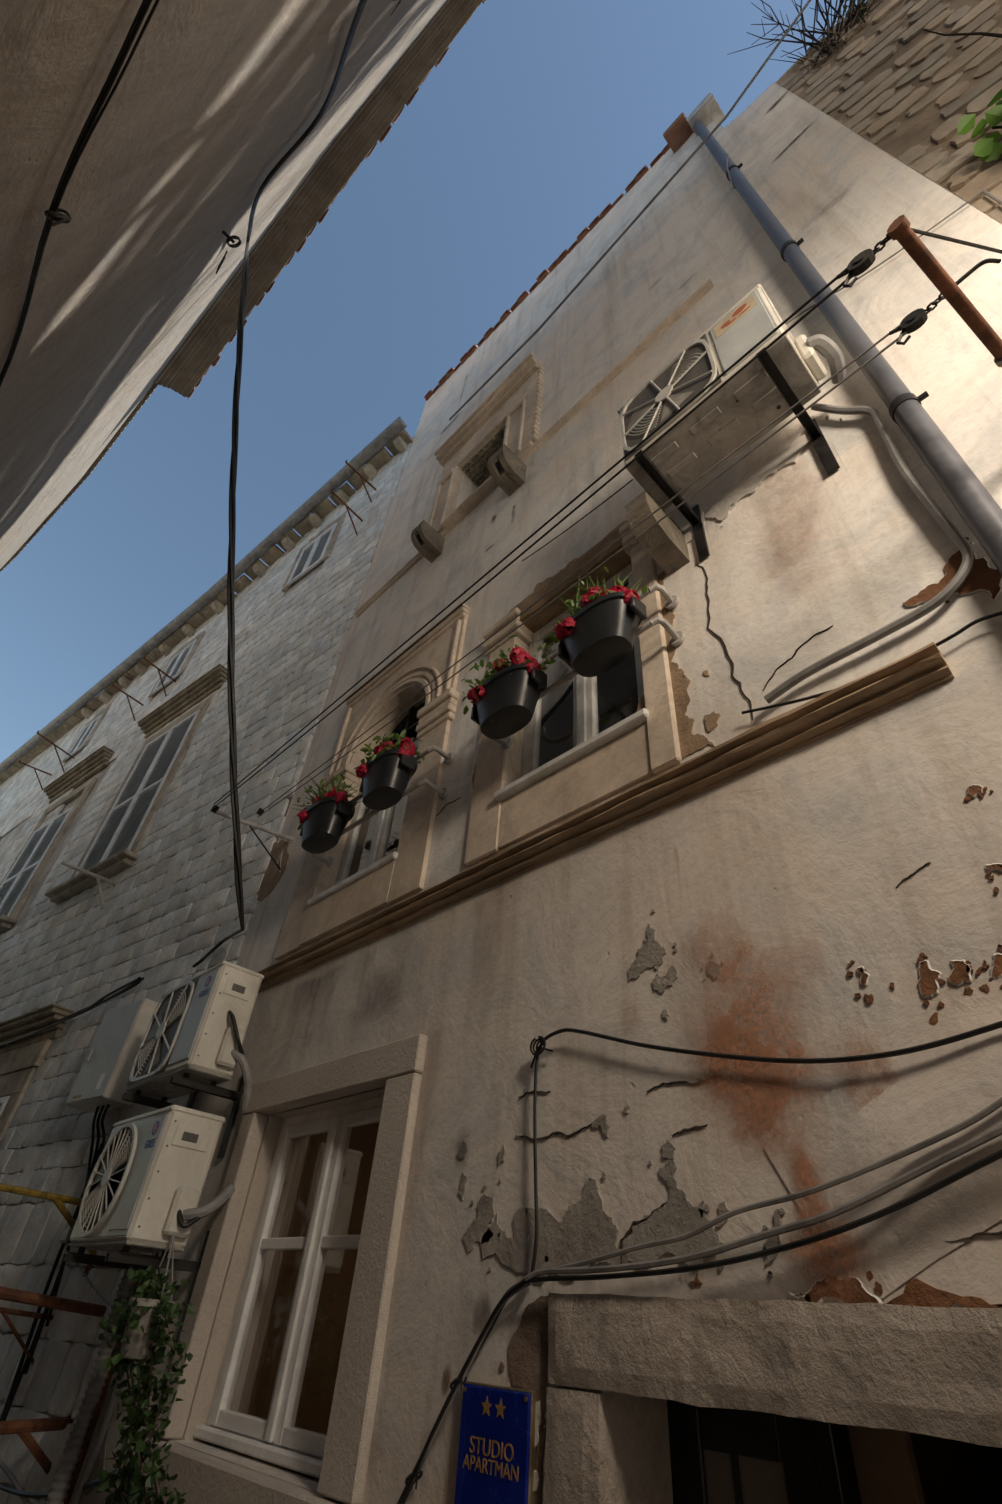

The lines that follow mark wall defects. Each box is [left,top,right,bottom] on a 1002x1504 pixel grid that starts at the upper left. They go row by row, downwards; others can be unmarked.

flaking render [902,537,1002,607]
flaking render [657,571,721,759]
crack [695,563,833,719]
spalling [984,863,1002,894]
flaking render [628,909,678,1020]
spalling [846,960,874,1004]
spalling [917,944,1002,1024]
crack [516,1124,591,1140]
corrosion [702,938,861,1291]
crack [945,1231,1002,1243]
flaking render [458,1139,730,1504]
spalling [787,1271,1002,1308]